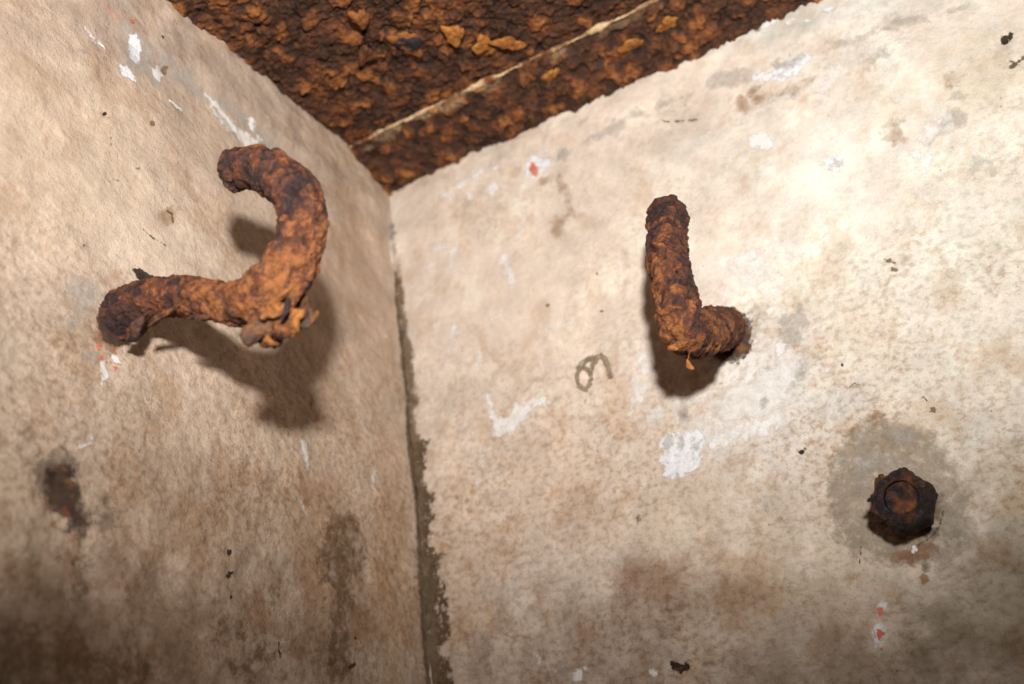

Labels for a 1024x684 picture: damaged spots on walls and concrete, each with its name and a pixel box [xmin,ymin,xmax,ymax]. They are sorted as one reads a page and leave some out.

corrosion [347,8,370,30]
corrosion [655,16,678,33]
corrosion [386,31,423,58]
corrosion [441,25,527,55]
corrosion [617,38,644,54]
corrosion [541,68,559,81]
corrosion [96,303,182,349]
corrosion [239,281,319,349]
corrosion [705,313,753,364]
corrosion [667,343,694,371]
peeling [658,410,787,480]
corrosion [39,458,92,537]